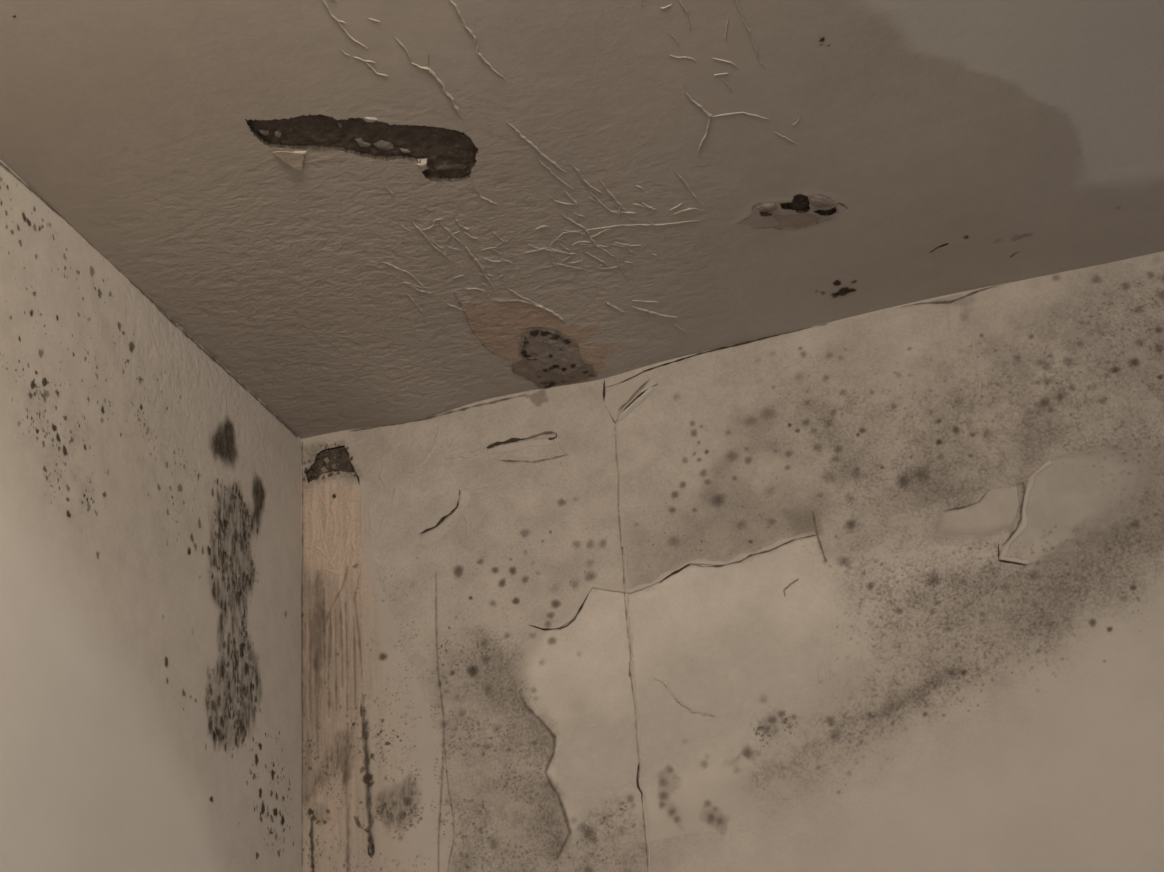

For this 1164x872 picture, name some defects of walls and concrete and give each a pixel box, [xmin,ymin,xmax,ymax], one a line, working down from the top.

damp [0,164,302,872]
flaking render [303,444,360,485]
flaking render [247,114,478,179]
crack [322,0,463,118]
peeling [447,288,642,405]
damp [0,0,1164,439]
crack [381,0,1048,872]
damp [301,251,1164,872]
peeling [730,189,848,233]
peeling [504,451,1139,851]